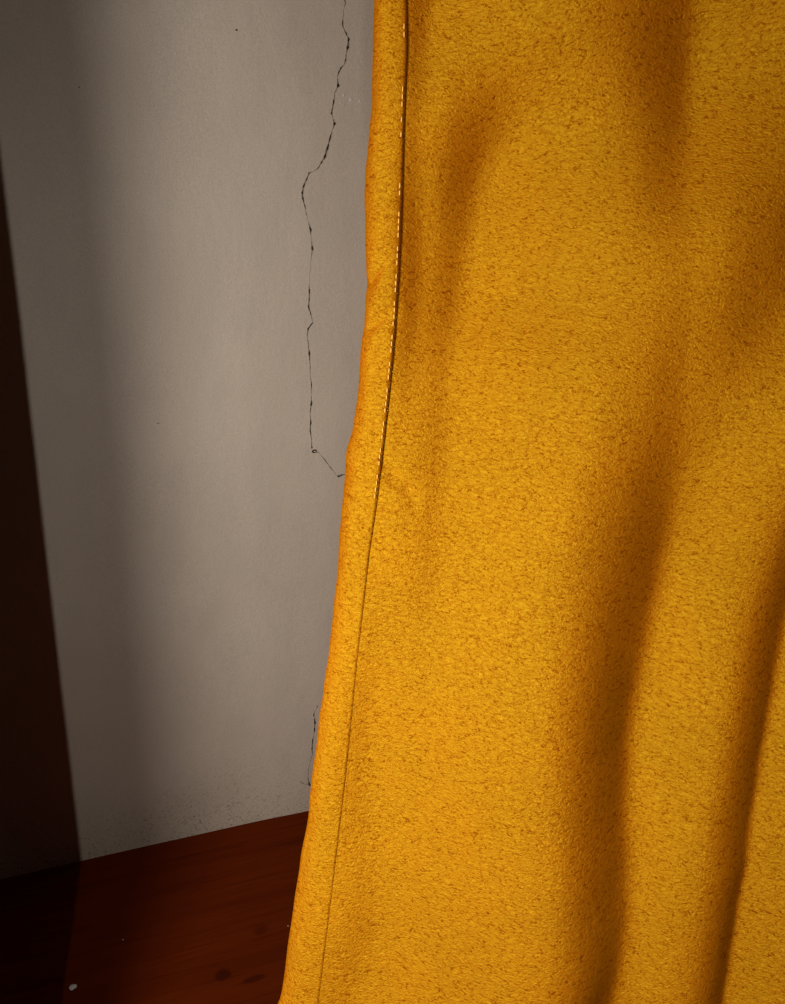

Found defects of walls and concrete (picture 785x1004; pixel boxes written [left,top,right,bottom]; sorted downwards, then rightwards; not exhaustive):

crack [300,0,350,477]
crack [300,706,318,787]